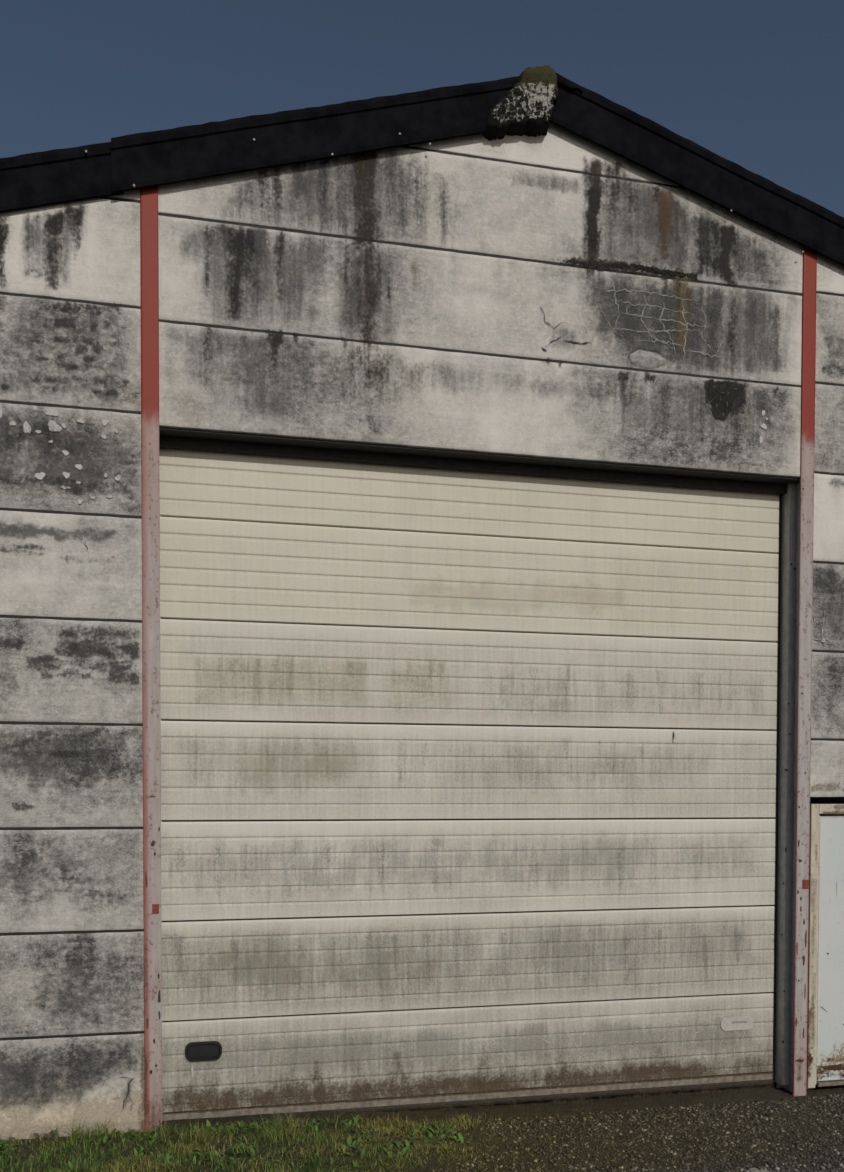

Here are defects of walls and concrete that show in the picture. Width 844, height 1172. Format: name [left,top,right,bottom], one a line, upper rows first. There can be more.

leakage [0,217,8,286]
leakage [26,204,83,288]
leakage [185,225,325,318]
leakage [238,152,404,385]
leakage [543,159,778,370]
rust [655,189,673,249]
leakage [3,301,130,395]
leakage [245,330,304,412]
crack [541,280,725,361]
peeling [0,405,113,504]
rust [795,985,844,1080]